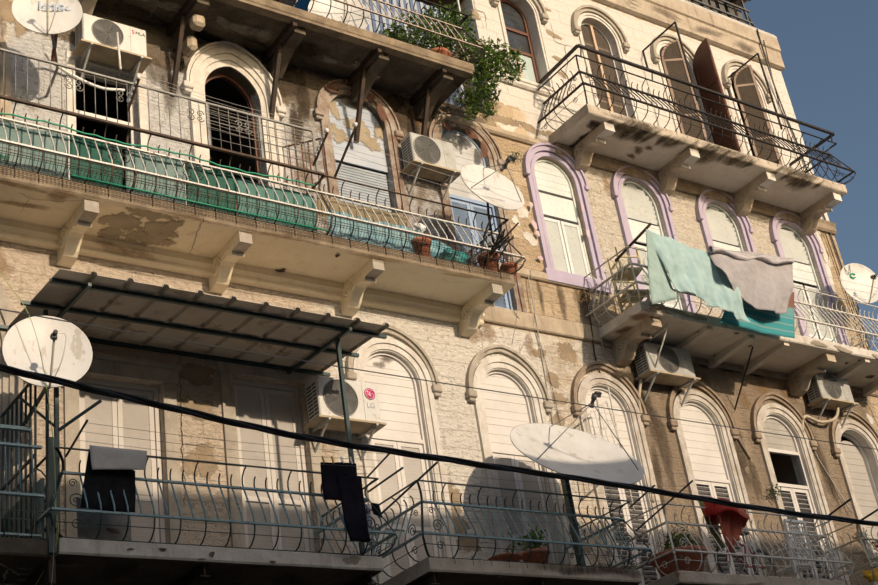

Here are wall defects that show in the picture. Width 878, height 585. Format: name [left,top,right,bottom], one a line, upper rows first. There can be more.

peeling [326,79,388,152]
leakage [522,115,754,213]
leakage [772,166,823,189]
peeling [95,208,185,247]
flaking render [177,396,215,421]
flaking render [180,442,220,478]